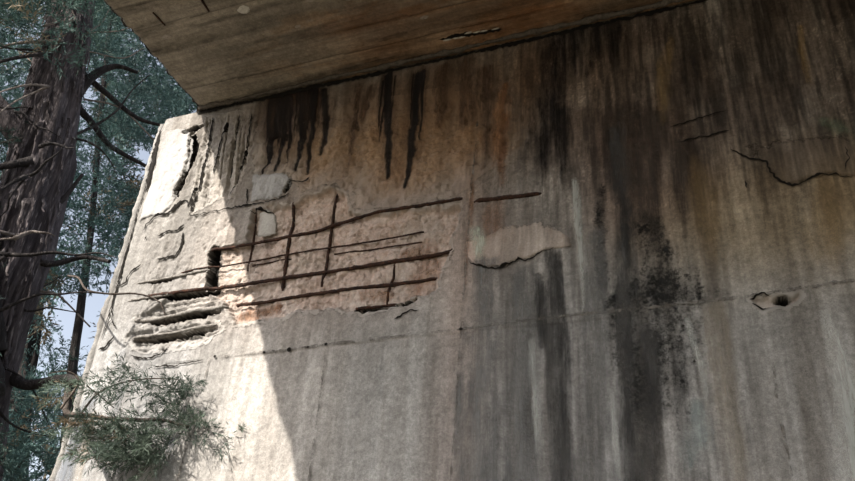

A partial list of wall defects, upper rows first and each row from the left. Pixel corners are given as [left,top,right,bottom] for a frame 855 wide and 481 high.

water stain [259,64,372,175]
spalling [122,86,537,355]
water stain [348,71,396,179]
crack [98,0,706,350]
rust [474,192,542,203]
crack [671,111,851,186]
water stain [456,229,601,481]
water stain [583,108,704,481]
crack [751,292,769,310]
spalling [746,288,807,315]